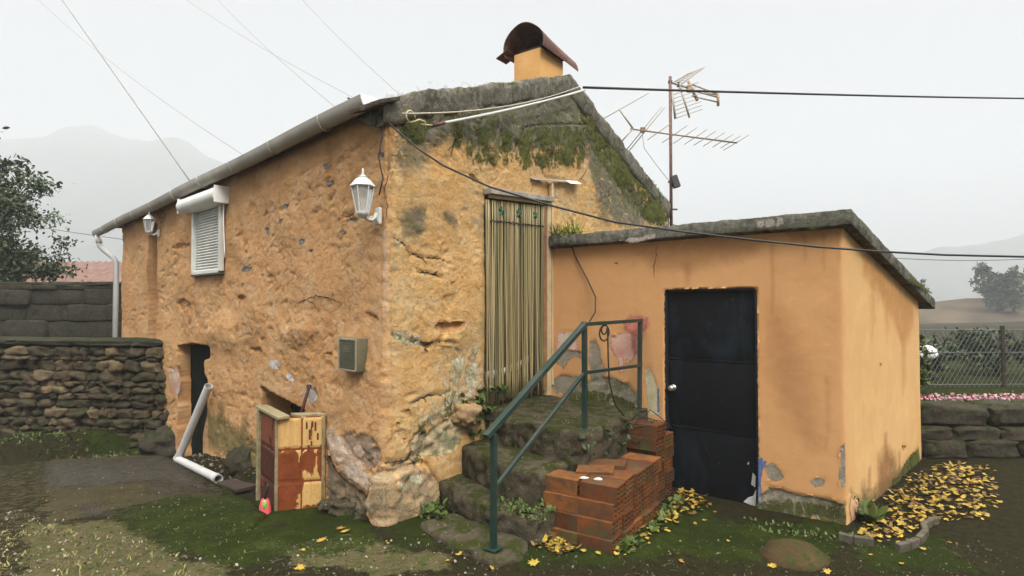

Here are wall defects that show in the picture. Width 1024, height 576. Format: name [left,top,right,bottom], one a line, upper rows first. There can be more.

leakage [394,88,655,242]
crack [298,295,340,310]
spalling [553,330,660,416]
peeling [325,427,382,515]
spalling [744,443,859,526]
leakage [855,450,920,519]